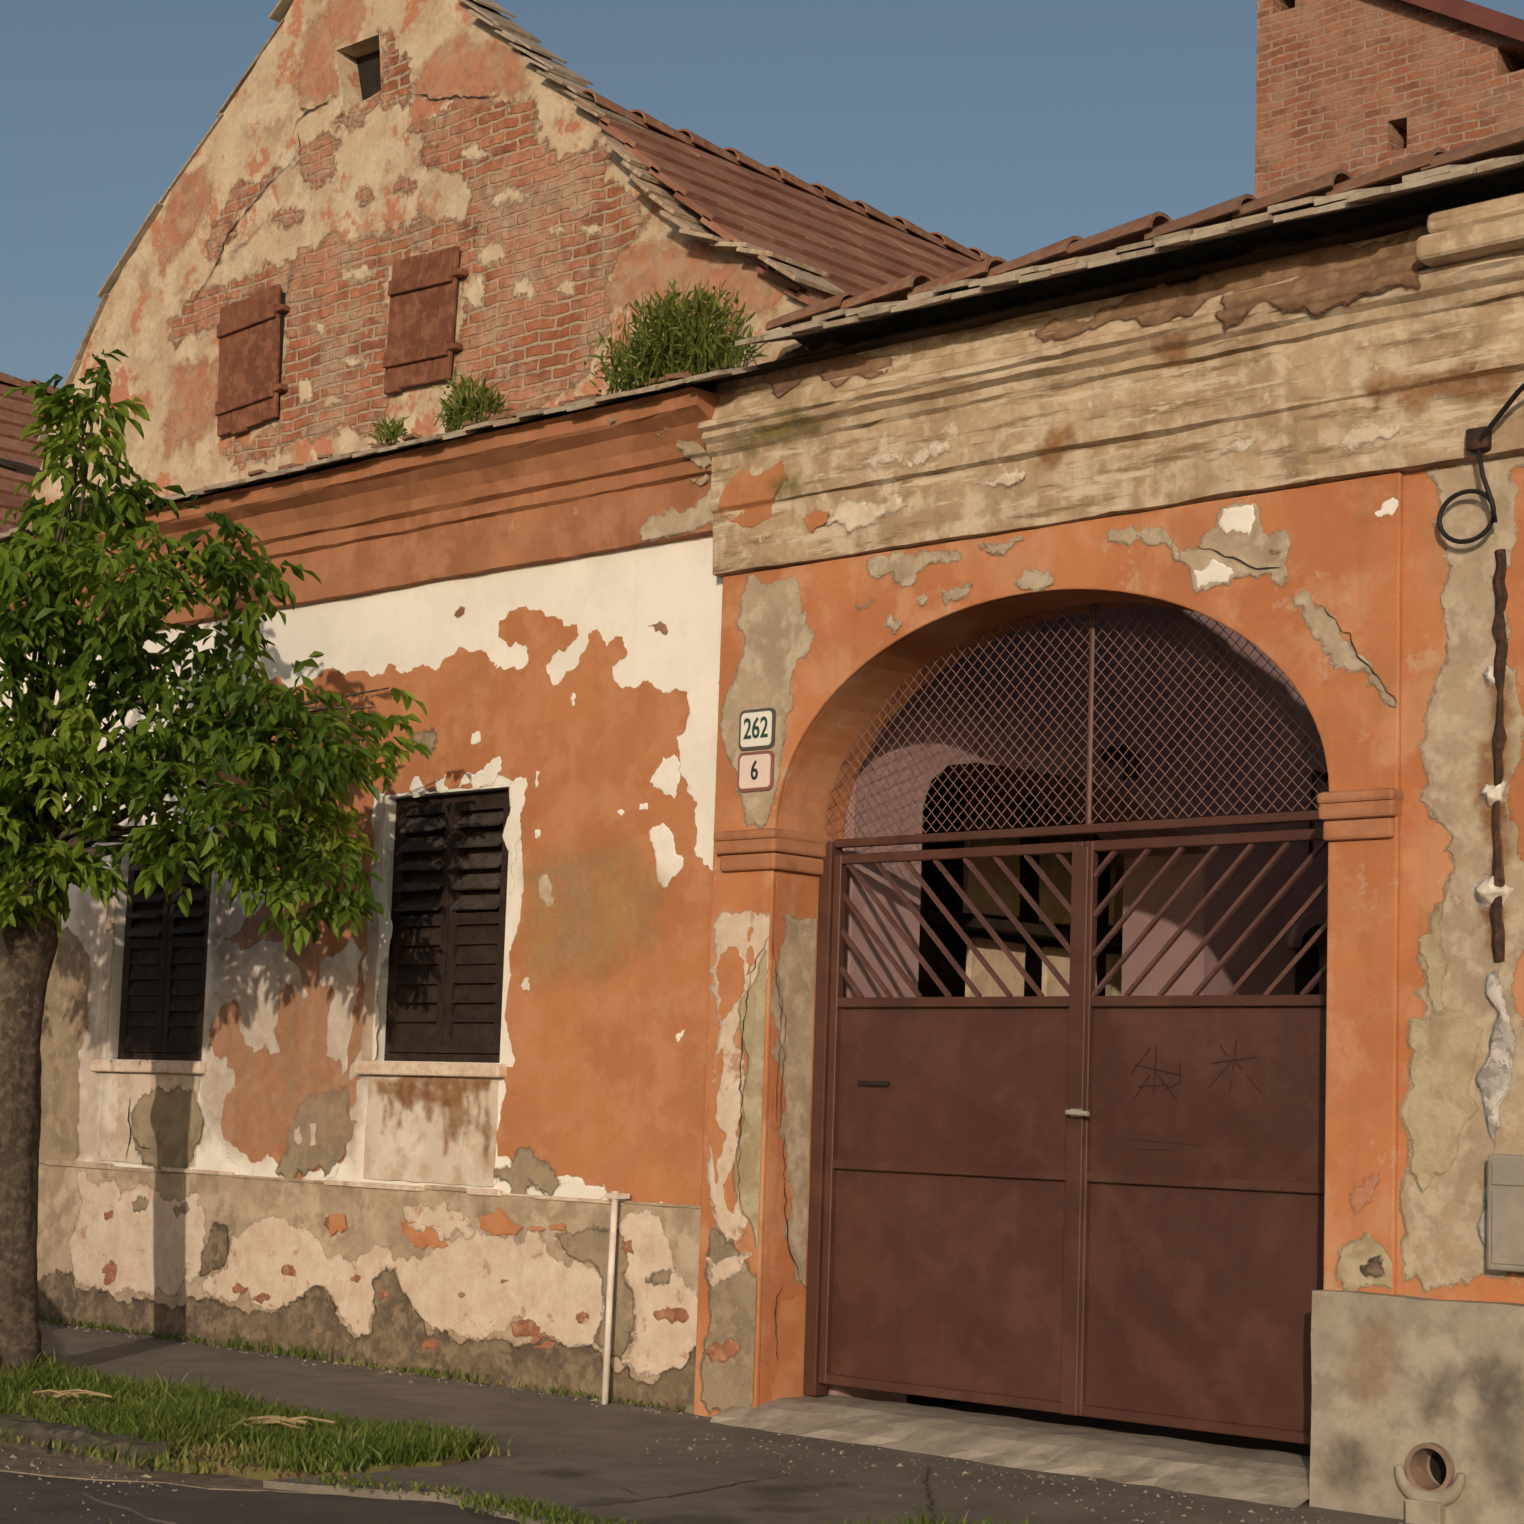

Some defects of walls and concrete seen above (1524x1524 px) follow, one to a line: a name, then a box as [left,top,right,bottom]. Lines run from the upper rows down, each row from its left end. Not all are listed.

crack [412,92,500,100]
crack [193,95,336,301]
spalling [158,0,784,477]
spalling [1029,225,1430,342]
peeling [803,493,908,533]
peeling [863,440,951,472]
peeling [1340,422,1401,452]
spalling [866,549,973,607]
spalling [1014,569,1054,592]
rust [1477,742,1506,867]
spalling [1335,456,1524,1292]
peeling [38,572,816,1414]